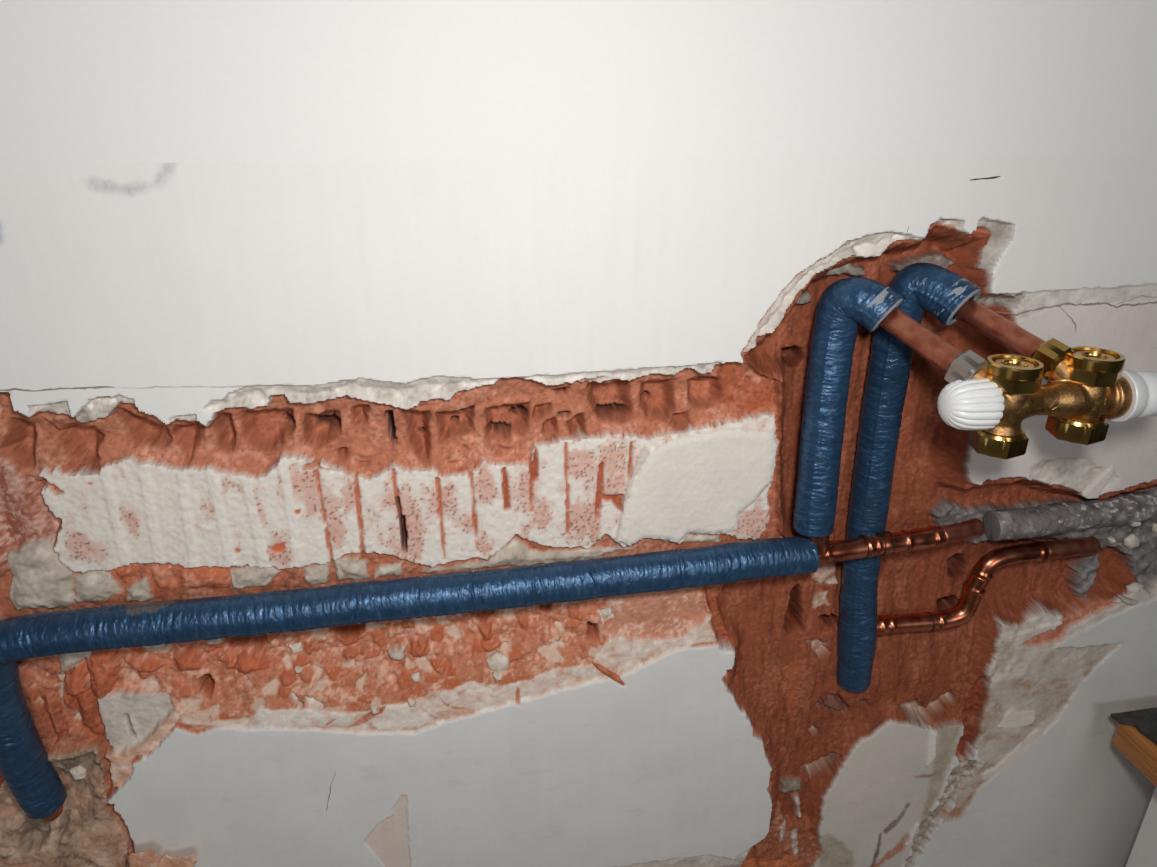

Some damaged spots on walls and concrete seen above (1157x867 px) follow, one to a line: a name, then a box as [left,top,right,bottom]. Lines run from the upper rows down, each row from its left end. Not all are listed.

flaking render [0,218,1016,621]
flaking render [966,415,1157,499]
flaking render [989,283,1157,372]
flaking render [0,586,719,867]
flaking render [614,846,759,867]
flaking render [812,584,1157,867]